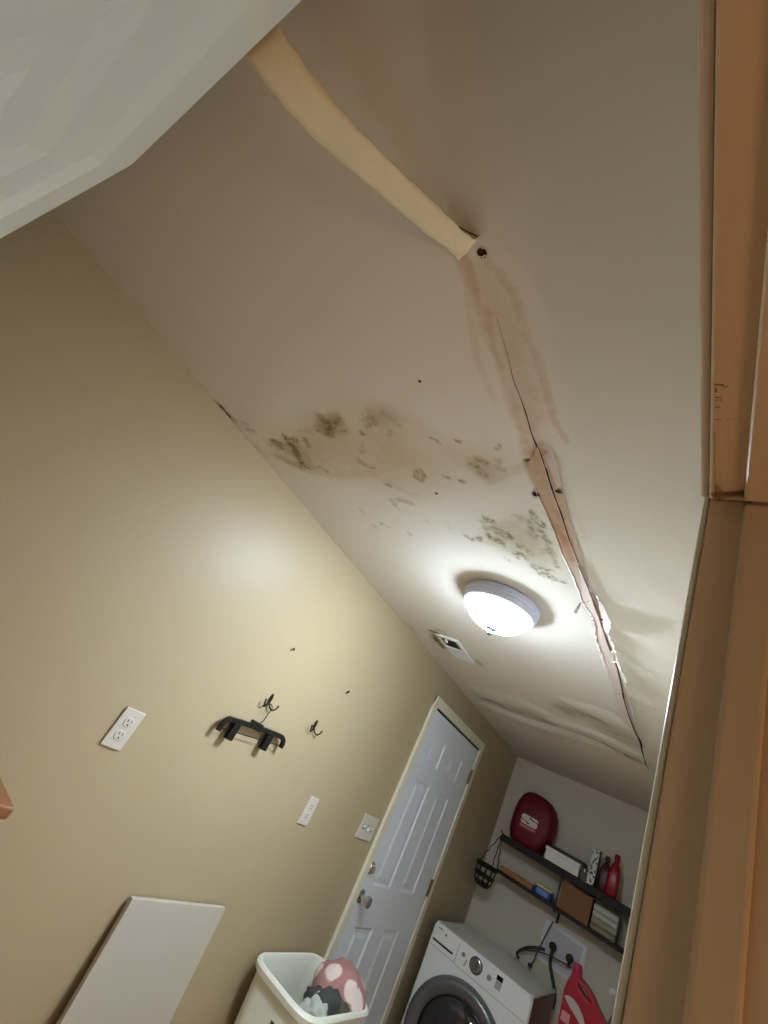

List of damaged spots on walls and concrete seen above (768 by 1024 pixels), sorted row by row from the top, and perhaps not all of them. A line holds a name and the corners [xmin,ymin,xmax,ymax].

crack [497,320,653,772]
peeling [532,481,633,712]